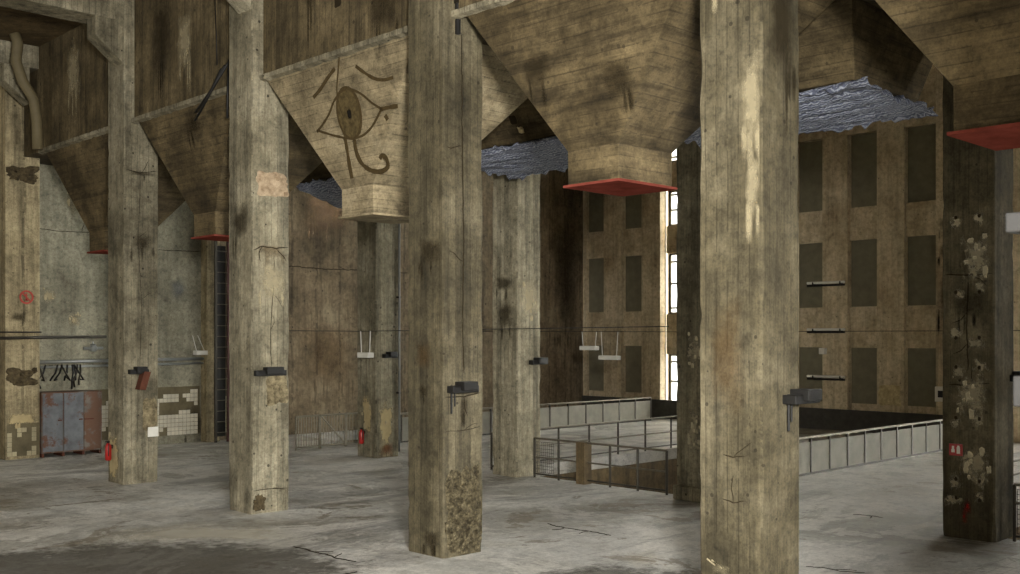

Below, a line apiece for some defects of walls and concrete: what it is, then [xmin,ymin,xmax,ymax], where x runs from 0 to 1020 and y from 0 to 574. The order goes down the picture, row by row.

spalling [6,166,40,185]
peeling [964,233,989,294]
spalling [7,422,39,457]
spalling [98,389,118,476]
spalling [143,386,200,436]
spalling [266,375,289,406]
peeling [362,398,393,443]
peeling [952,365,984,427]
peeling [946,447,991,503]
spalling [445,464,482,555]
crack [294,546,357,574]